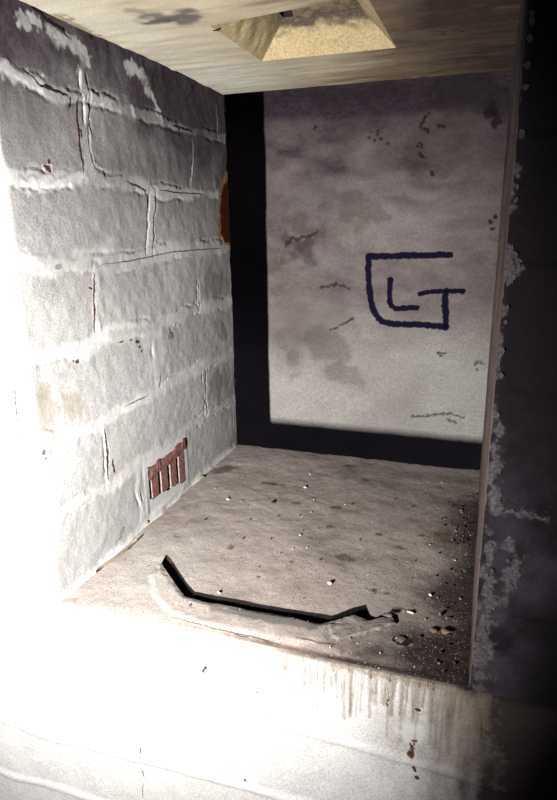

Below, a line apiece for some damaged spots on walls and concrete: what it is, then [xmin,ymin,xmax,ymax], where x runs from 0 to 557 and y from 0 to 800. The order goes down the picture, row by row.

water stain [26,10,89,127]
crack [22,68,101,174]
rust [218,171,231,247]
rust [407,740,419,780]